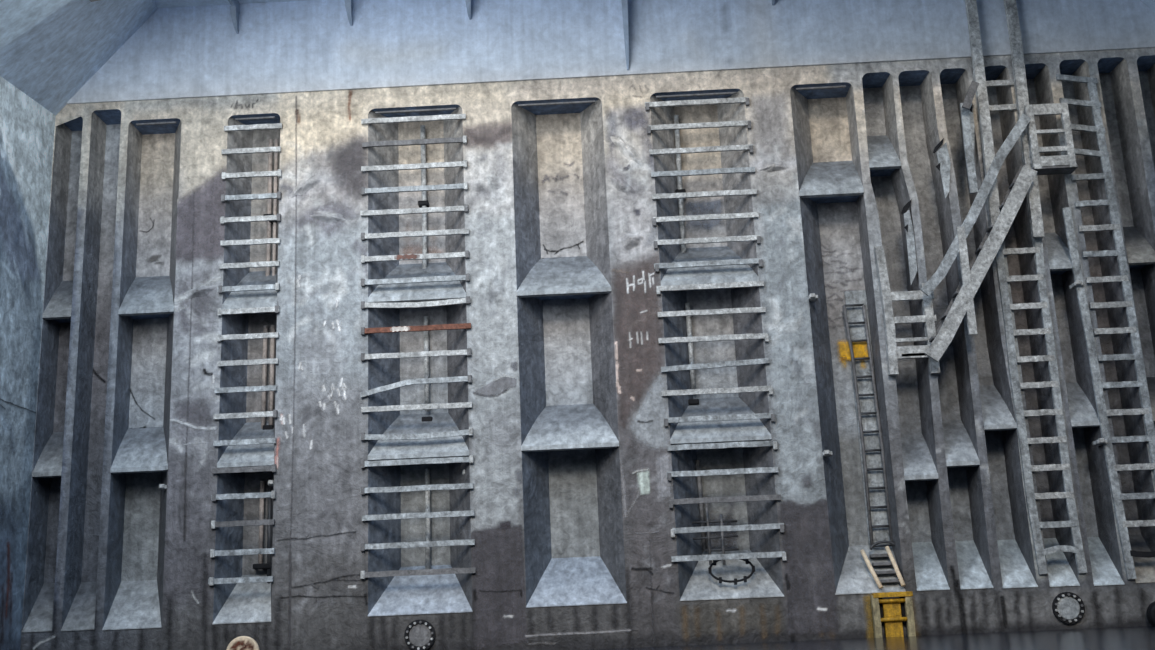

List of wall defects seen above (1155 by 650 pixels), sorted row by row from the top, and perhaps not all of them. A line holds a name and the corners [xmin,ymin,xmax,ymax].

damp [706,510,736,552]